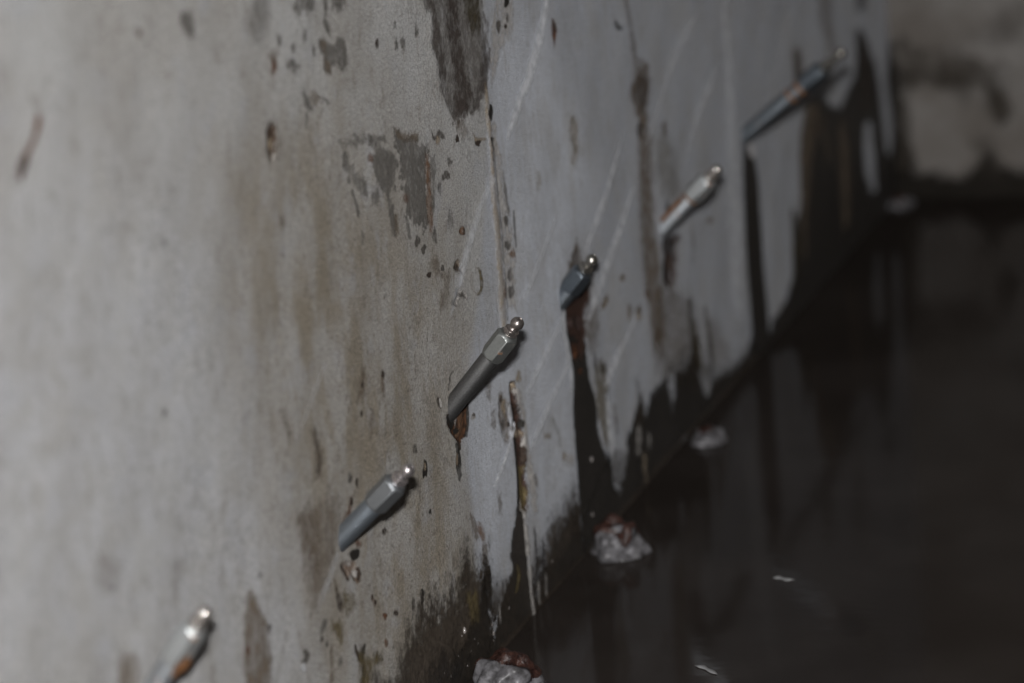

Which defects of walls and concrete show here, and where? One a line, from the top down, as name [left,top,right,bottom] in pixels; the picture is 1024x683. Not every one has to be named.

water stain [426,0,490,123]
water stain [343,27,1024,683]